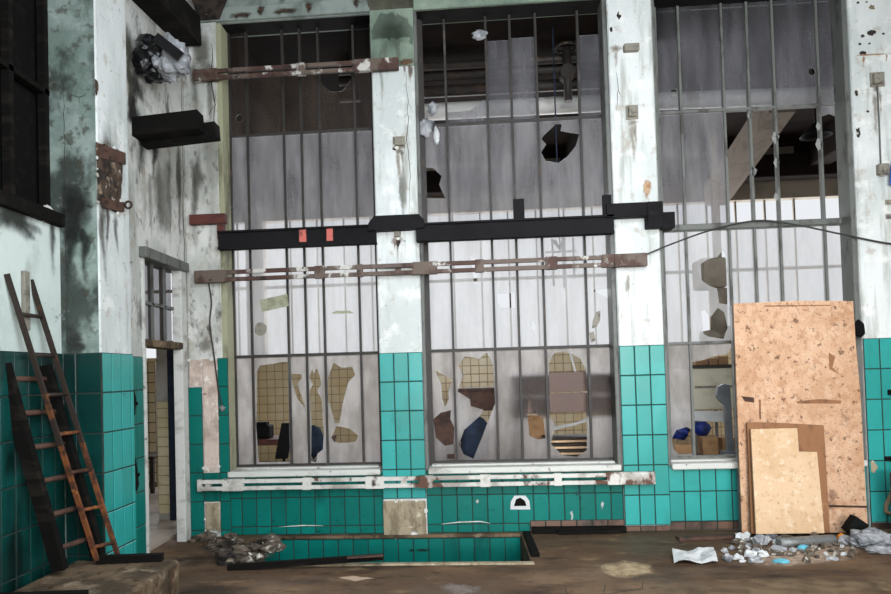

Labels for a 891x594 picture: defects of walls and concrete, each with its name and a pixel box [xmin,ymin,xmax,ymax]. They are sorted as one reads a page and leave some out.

leakage [139,141,157,167]
leakage [158,150,181,228]
leakage [193,163,202,212]
leakage [66,229,90,266]
leakage [100,205,117,250]
peeling [187,357,221,473]
peeling [383,499,428,539]